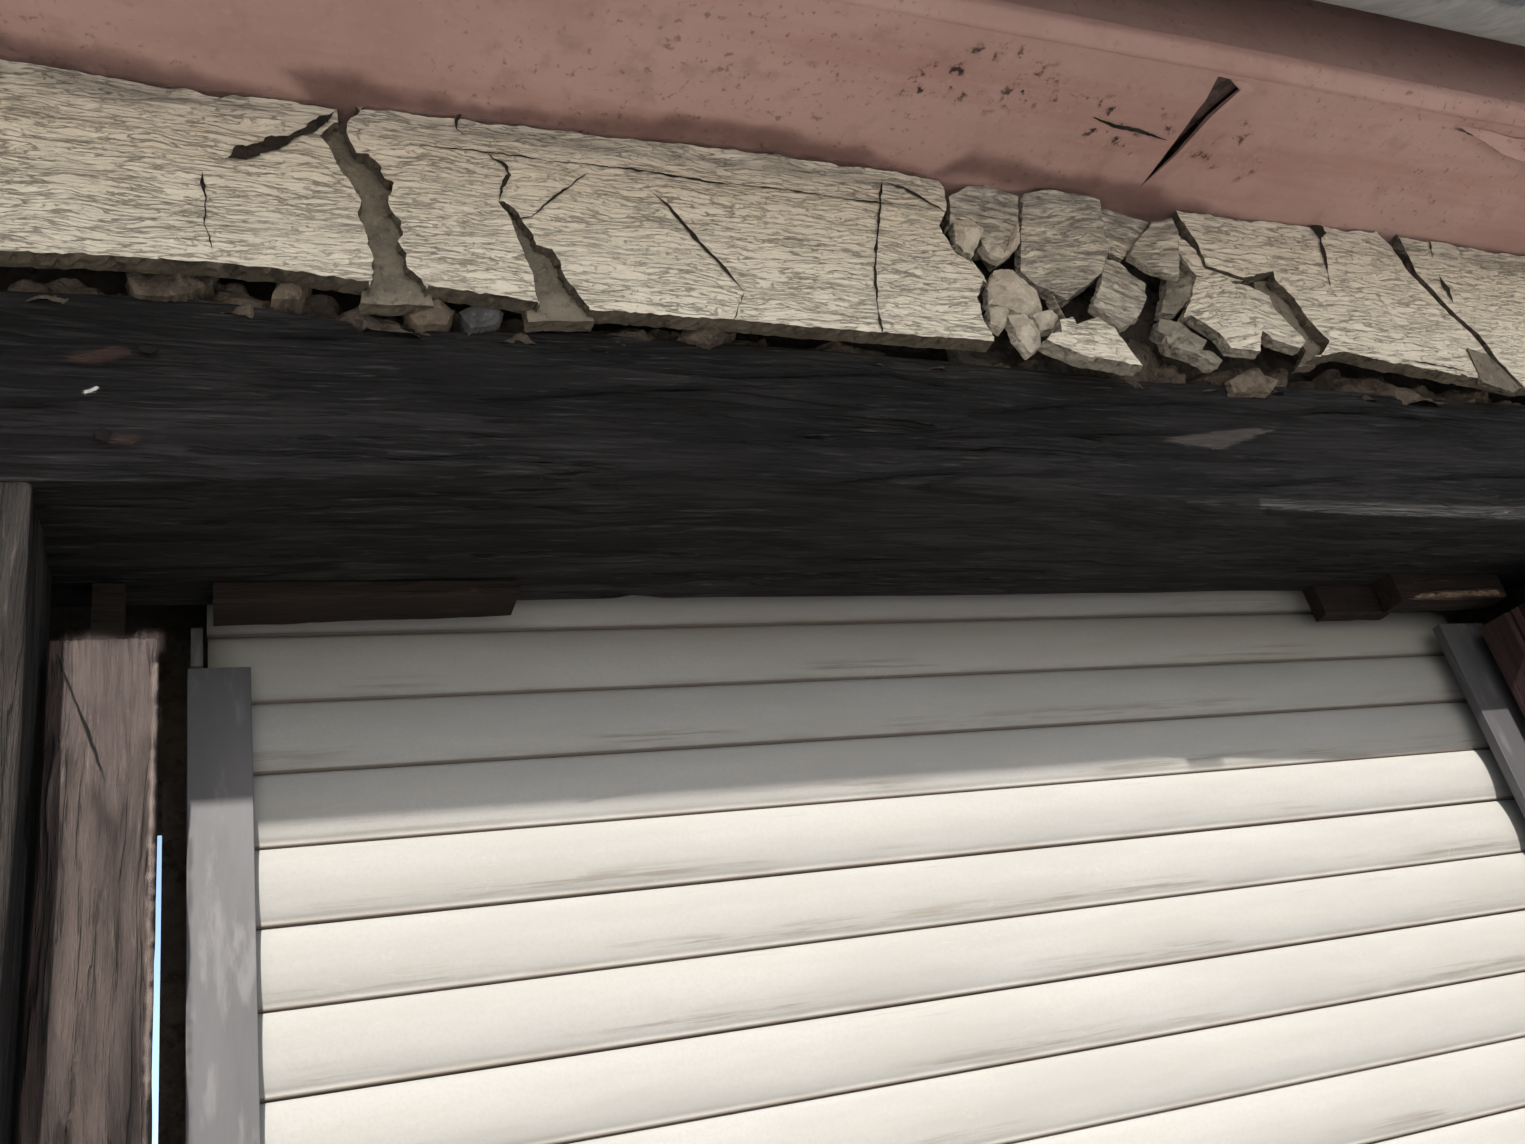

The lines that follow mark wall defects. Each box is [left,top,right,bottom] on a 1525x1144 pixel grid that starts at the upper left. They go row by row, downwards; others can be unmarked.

crack [200,110,338,250]
spalling [324,121,434,316]
crack [406,114,945,334]
spalling [932,185,1320,398]
crack [1311,224,1331,285]
crack [1388,241,1453,302]
crack [1408,348,1520,396]